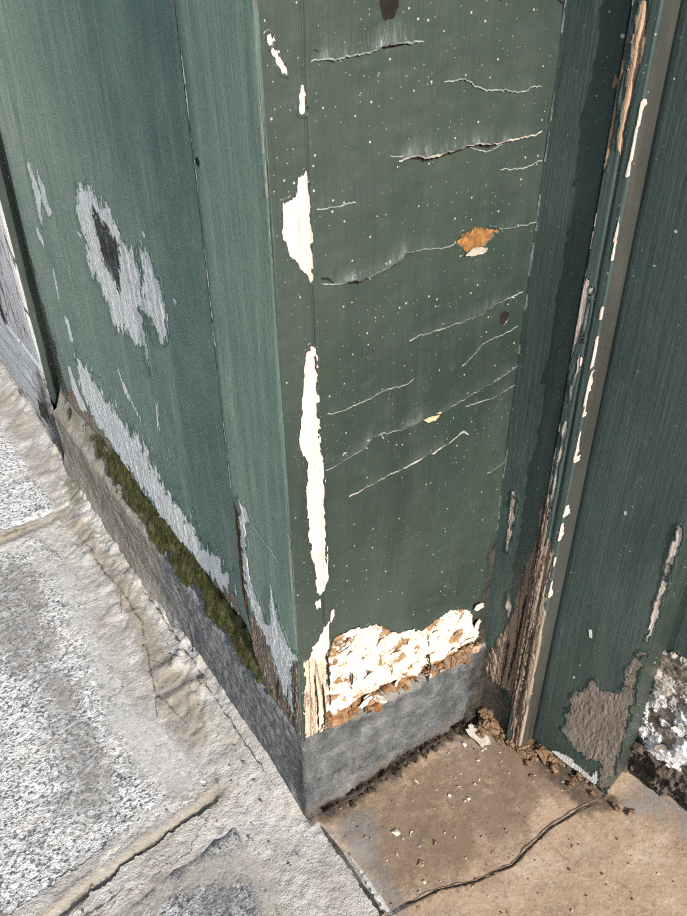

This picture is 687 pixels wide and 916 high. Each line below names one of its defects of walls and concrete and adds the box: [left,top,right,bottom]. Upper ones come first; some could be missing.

peeling [64,0,300,718]
peeling [260,106,317,286]
peeling [296,342,331,609]
crack [311,15,424,62]
crack [321,231,458,285]
crack [325,283,524,497]
crack [391,119,544,170]
peeling [566,273,604,417]
peeling [604,0,651,177]
peeling [551,522,687,809]
crack [62,798,218,916]
crack [320,799,599,916]